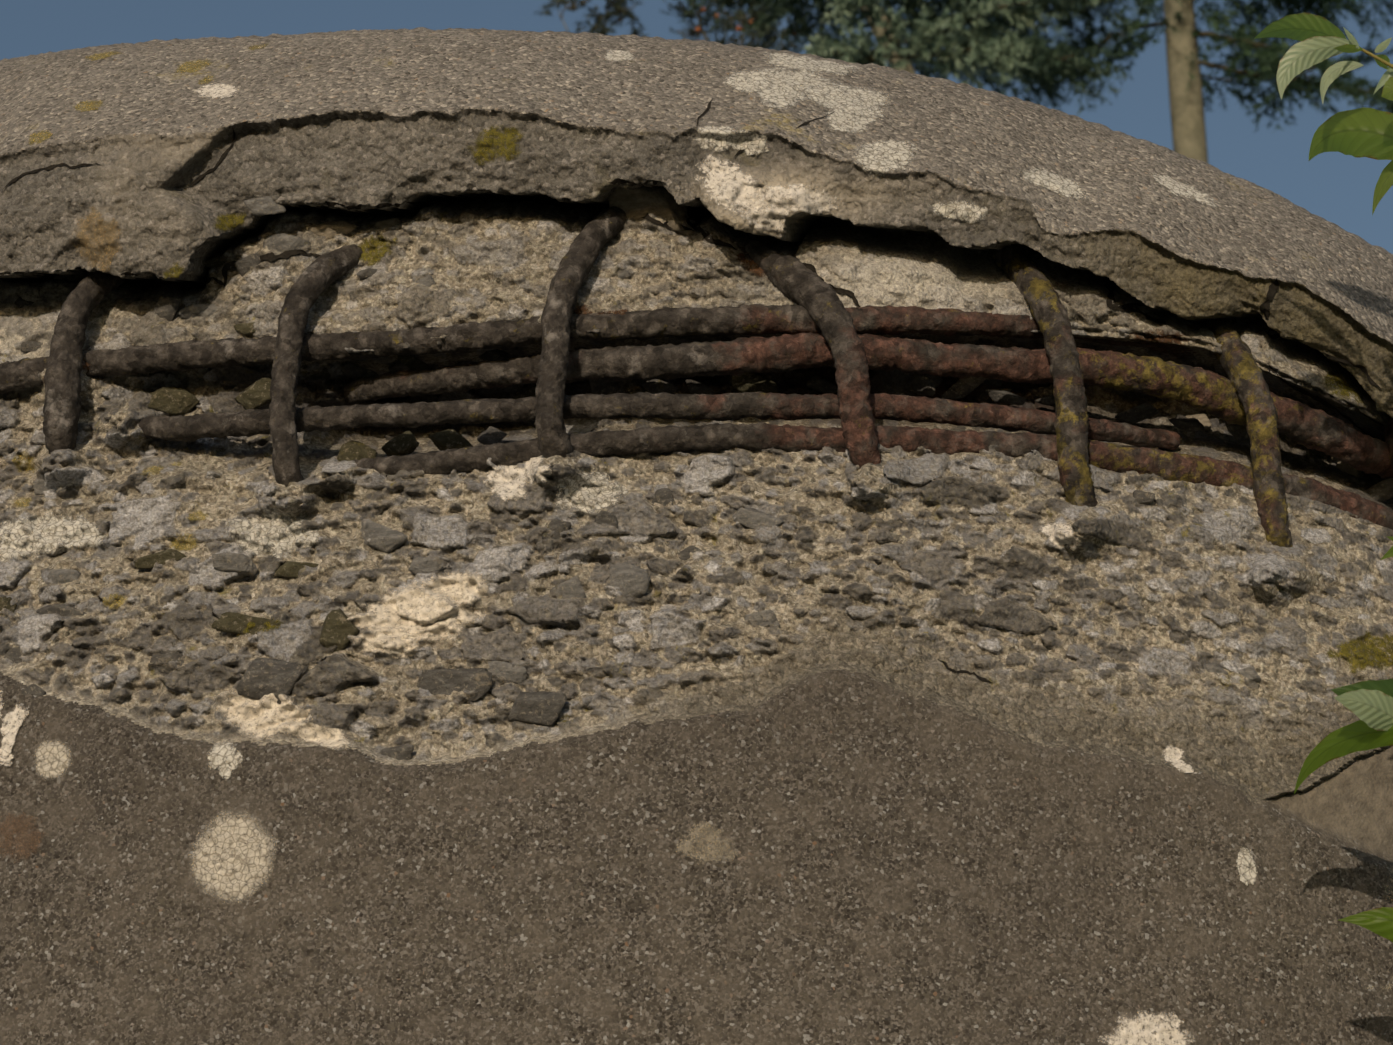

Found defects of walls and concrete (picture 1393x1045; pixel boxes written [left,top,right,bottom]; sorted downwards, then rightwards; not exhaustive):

crack [697,98,713,125]
crack [2,163,100,191]
crack [189,129,235,186]
crack [298,178,737,250]
crack [0,270,88,280]
crack [121,249,320,289]
crack [795,252,860,307]
crack [1079,266,1167,326]
rust [1123,329,1194,359]
crack [1260,278,1385,442]
spalling [0,107,1393,805]
efflorescence [0,691,29,766]